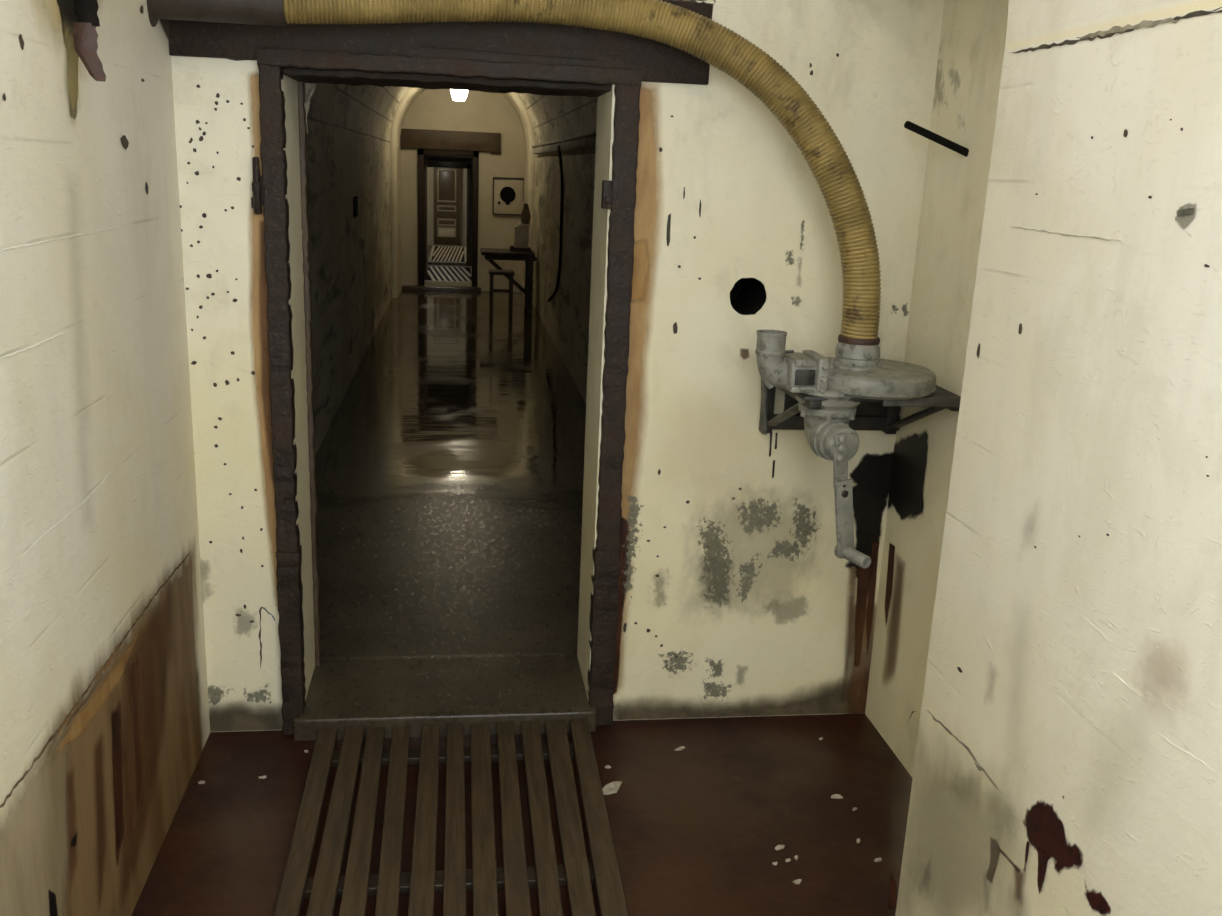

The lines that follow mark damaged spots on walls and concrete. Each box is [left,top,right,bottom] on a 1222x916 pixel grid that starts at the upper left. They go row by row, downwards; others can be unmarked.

corrosion [44,0,62,26]
corrosion [68,36,77,106]
crack [1012,7,1222,53]
water stain [698,498,820,607]
water stain [613,542,879,720]
corrosion [885,543,903,675]
water stain [0,726,67,916]